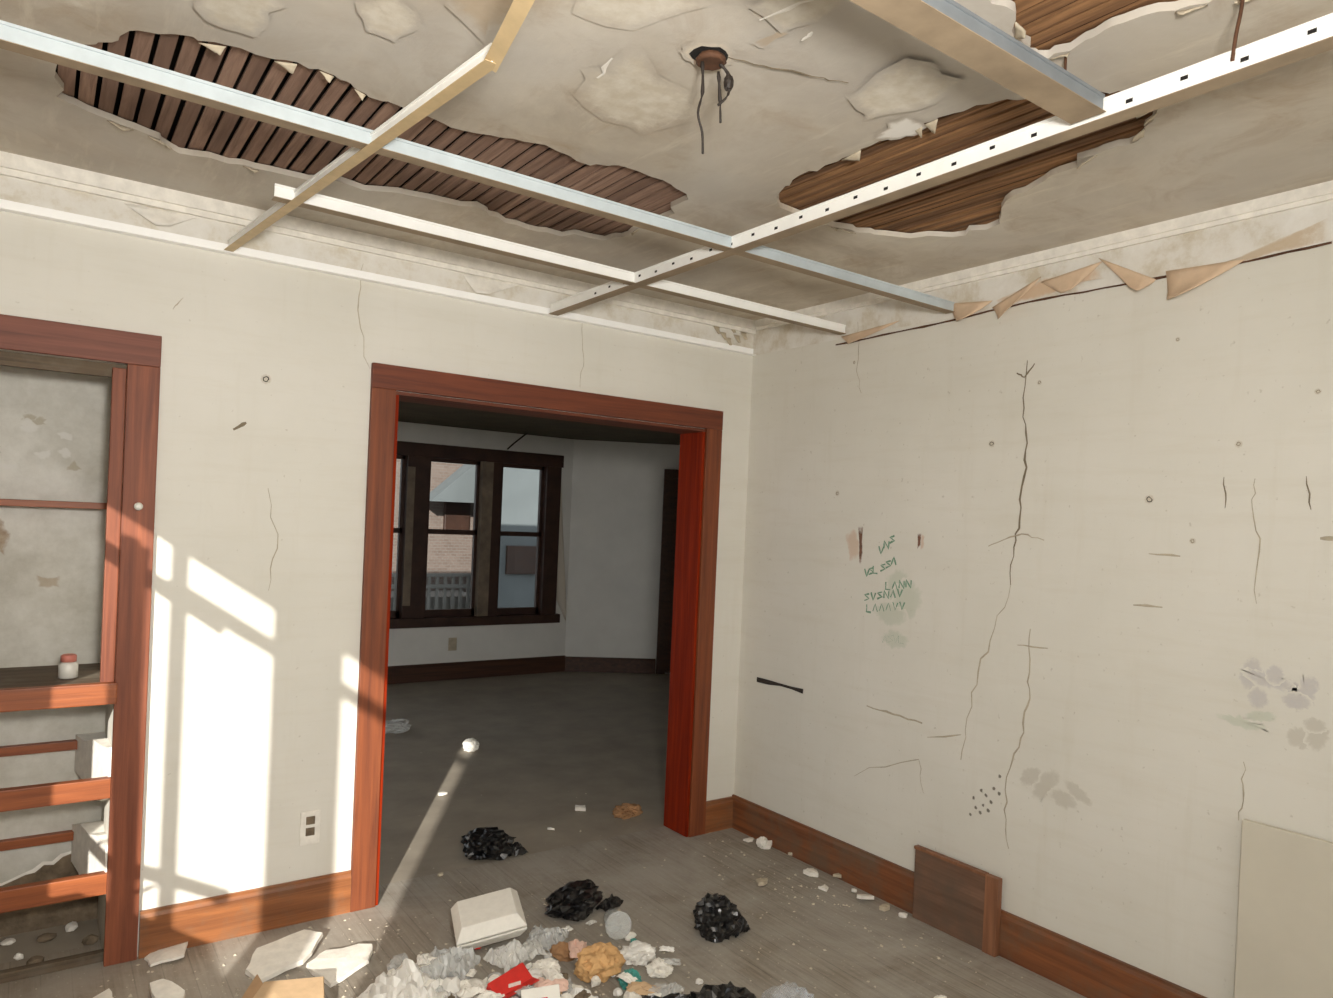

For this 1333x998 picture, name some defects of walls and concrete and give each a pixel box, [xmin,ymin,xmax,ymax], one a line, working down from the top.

flaking render [58,65,351,175]
flaking render [87,0,401,130]
flaking render [342,153,641,236]
flaking render [398,116,687,215]
flaking render [779,58,1055,210]
flaking render [831,111,1157,234]
flaking render [1012,0,1208,60]
crack [960,360,1044,760]
crack [1223,478,1261,604]
crack [1004,629,1031,849]
flaking render [0,851,79,888]
flaking render [0,896,99,965]